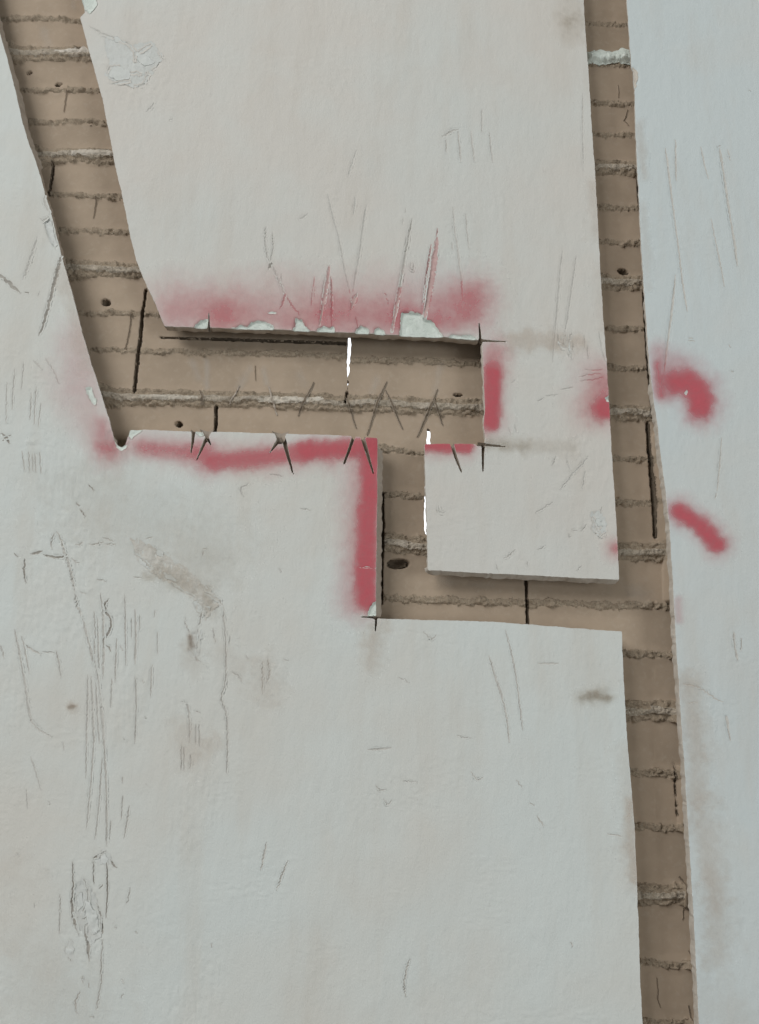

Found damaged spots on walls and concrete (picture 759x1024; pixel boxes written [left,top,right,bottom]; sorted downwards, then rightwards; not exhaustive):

spalling [194,319,208,329]
spalling [232,311,276,330]